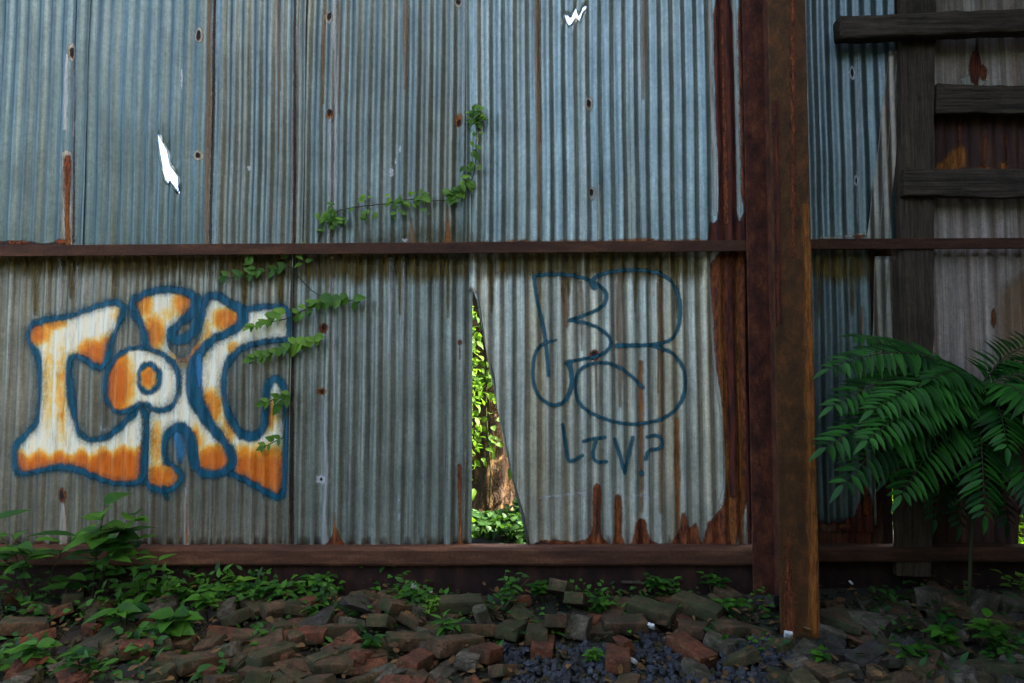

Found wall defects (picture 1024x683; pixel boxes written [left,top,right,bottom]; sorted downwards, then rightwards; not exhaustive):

rust [0,150,73,245]
rust [597,0,752,544]
rust [535,361,658,545]